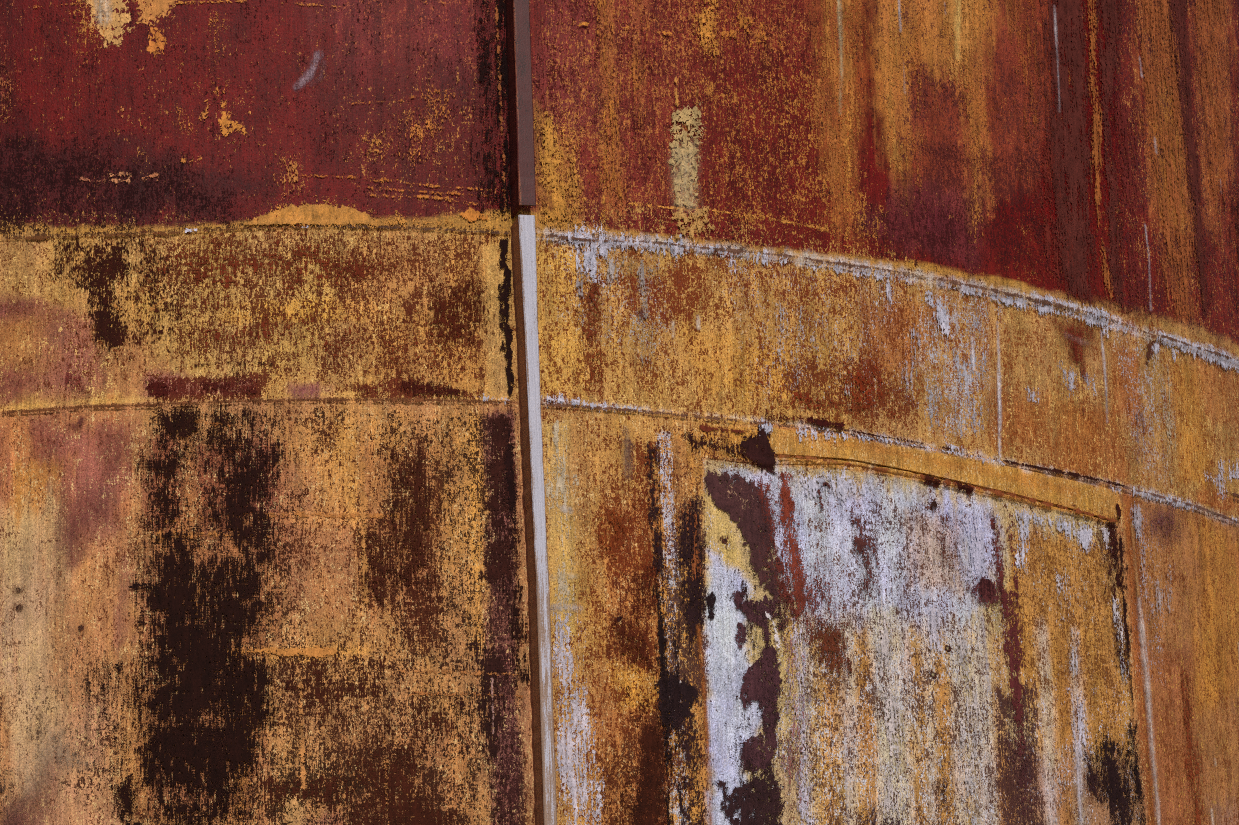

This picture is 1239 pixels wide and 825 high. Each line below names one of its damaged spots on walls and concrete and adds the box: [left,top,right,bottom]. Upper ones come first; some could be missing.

peeling [64,0,184,57]
peeling [665,77,715,242]
rust [35,211,530,825]
peeling [704,466,823,825]
rust [592,355,1152,825]
rust [1177,667,1207,825]